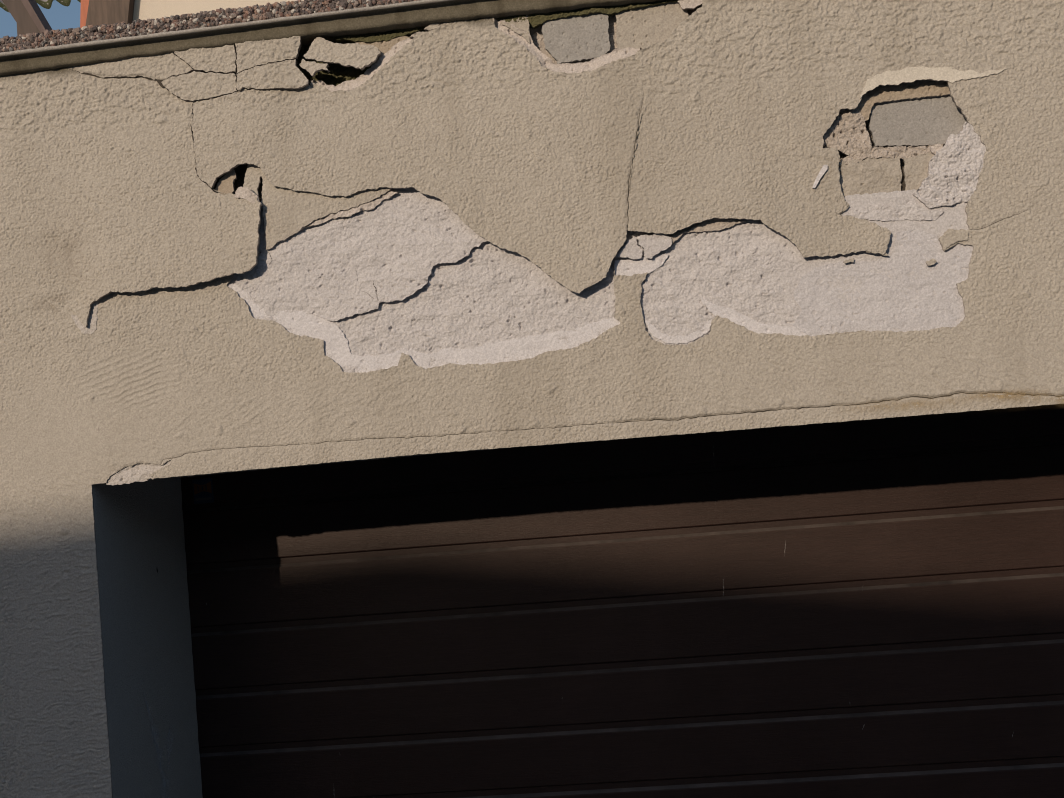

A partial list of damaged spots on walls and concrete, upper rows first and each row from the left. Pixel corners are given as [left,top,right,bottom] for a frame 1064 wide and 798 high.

crack [75,46,256,140]
flaking render [297,23,440,92]
flaking render [494,0,703,74]
crack [627,102,643,215]
flaking render [211,66,1006,373]
peeling [106,460,171,485]
crack [111,392,1064,481]